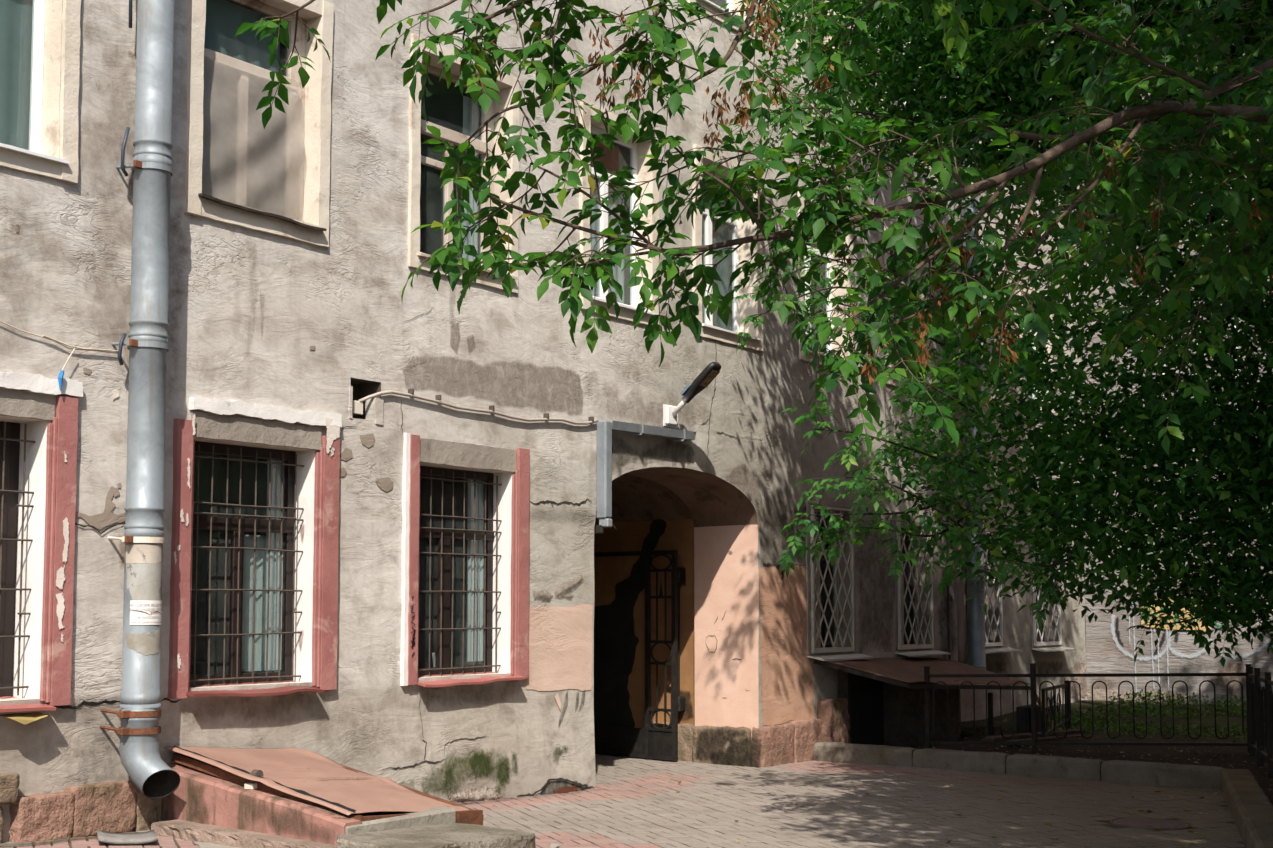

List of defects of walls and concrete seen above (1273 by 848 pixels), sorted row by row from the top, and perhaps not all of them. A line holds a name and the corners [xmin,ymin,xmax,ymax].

spalling [325,378,384,476]
peeling [376,477,393,492]
crack [530,498,590,506]
flaking render [56,483,126,642]
crack [384,694,485,770]